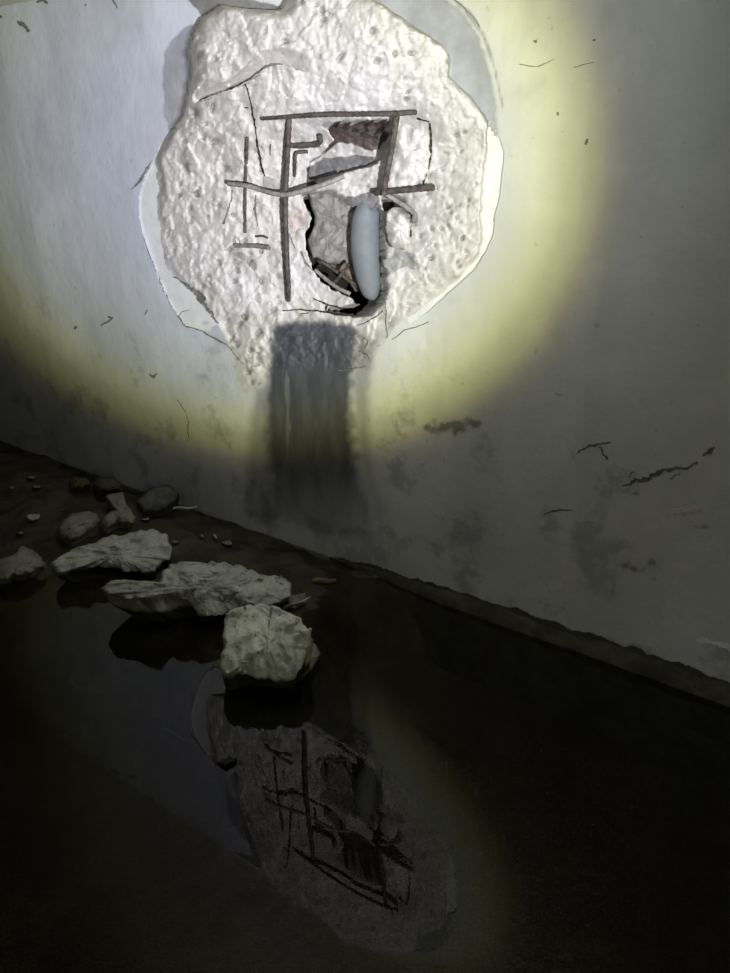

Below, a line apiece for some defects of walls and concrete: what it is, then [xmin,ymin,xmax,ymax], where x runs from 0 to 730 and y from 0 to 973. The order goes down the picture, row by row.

corrosion [326,120,389,151]
spalling [131,0,504,399]
leakage [268,322,356,496]
leakage [425,421,481,434]
crack [577,442,611,460]
crack [622,447,715,486]